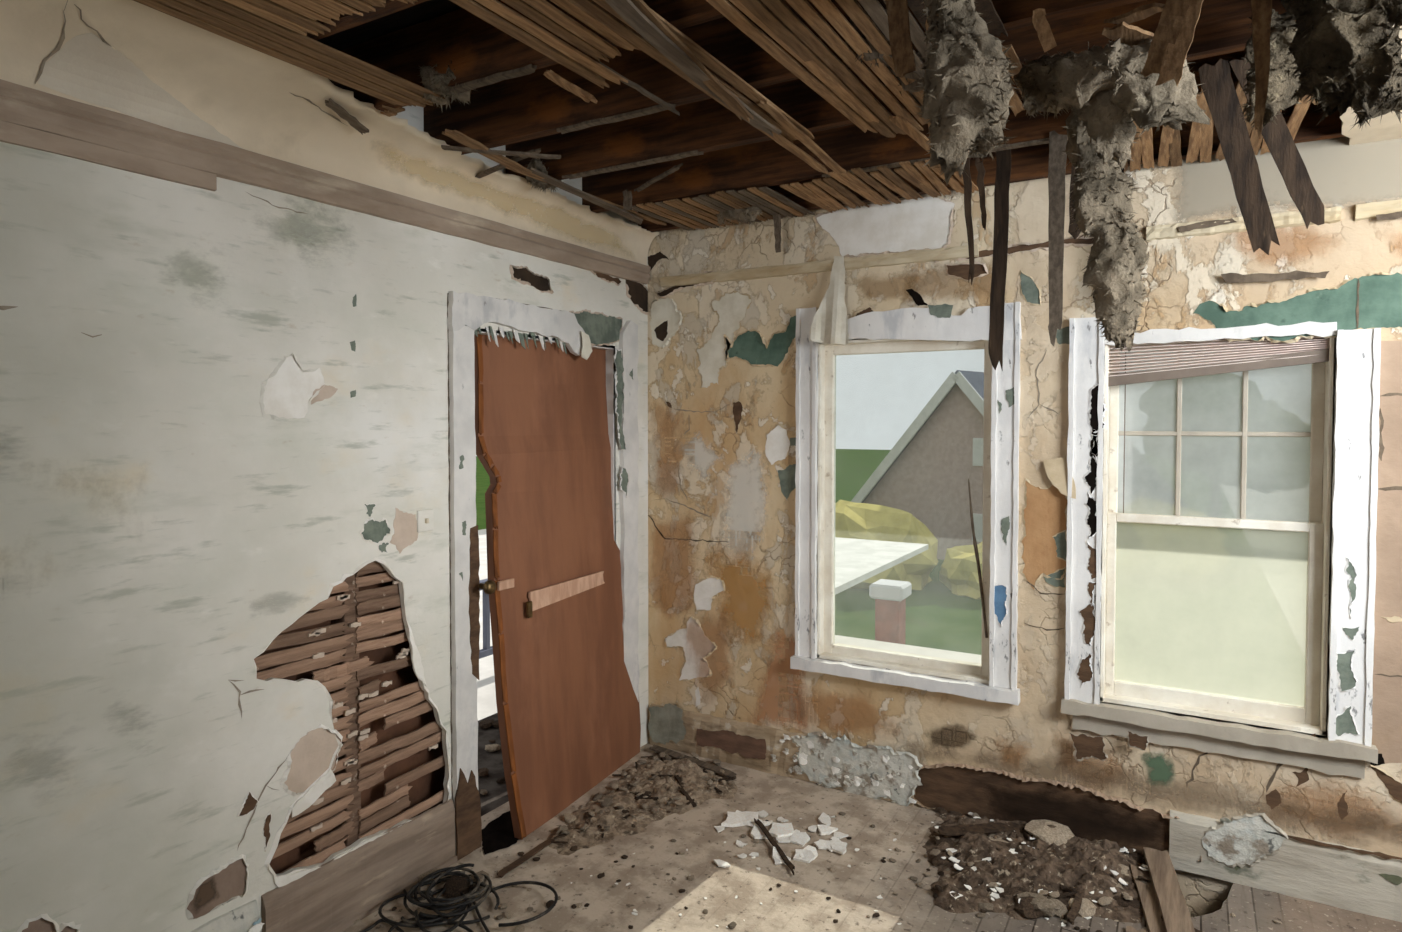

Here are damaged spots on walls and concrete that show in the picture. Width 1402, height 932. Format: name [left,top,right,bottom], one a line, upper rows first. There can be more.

crack [35,0,112,84]
peeling [591,196,1094,388]
peeling [259,353,356,420]
peeling [569,309,634,498]
spalling [731,400,744,434]
peeling [763,424,796,499]
peeling [997,387,1014,413]
peeling [1001,383,1107,687]
spalling [186,503,451,919]
peeling [648,575,1180,819]
peeling [1336,557,1360,736]
peeling [17,914,82,932]